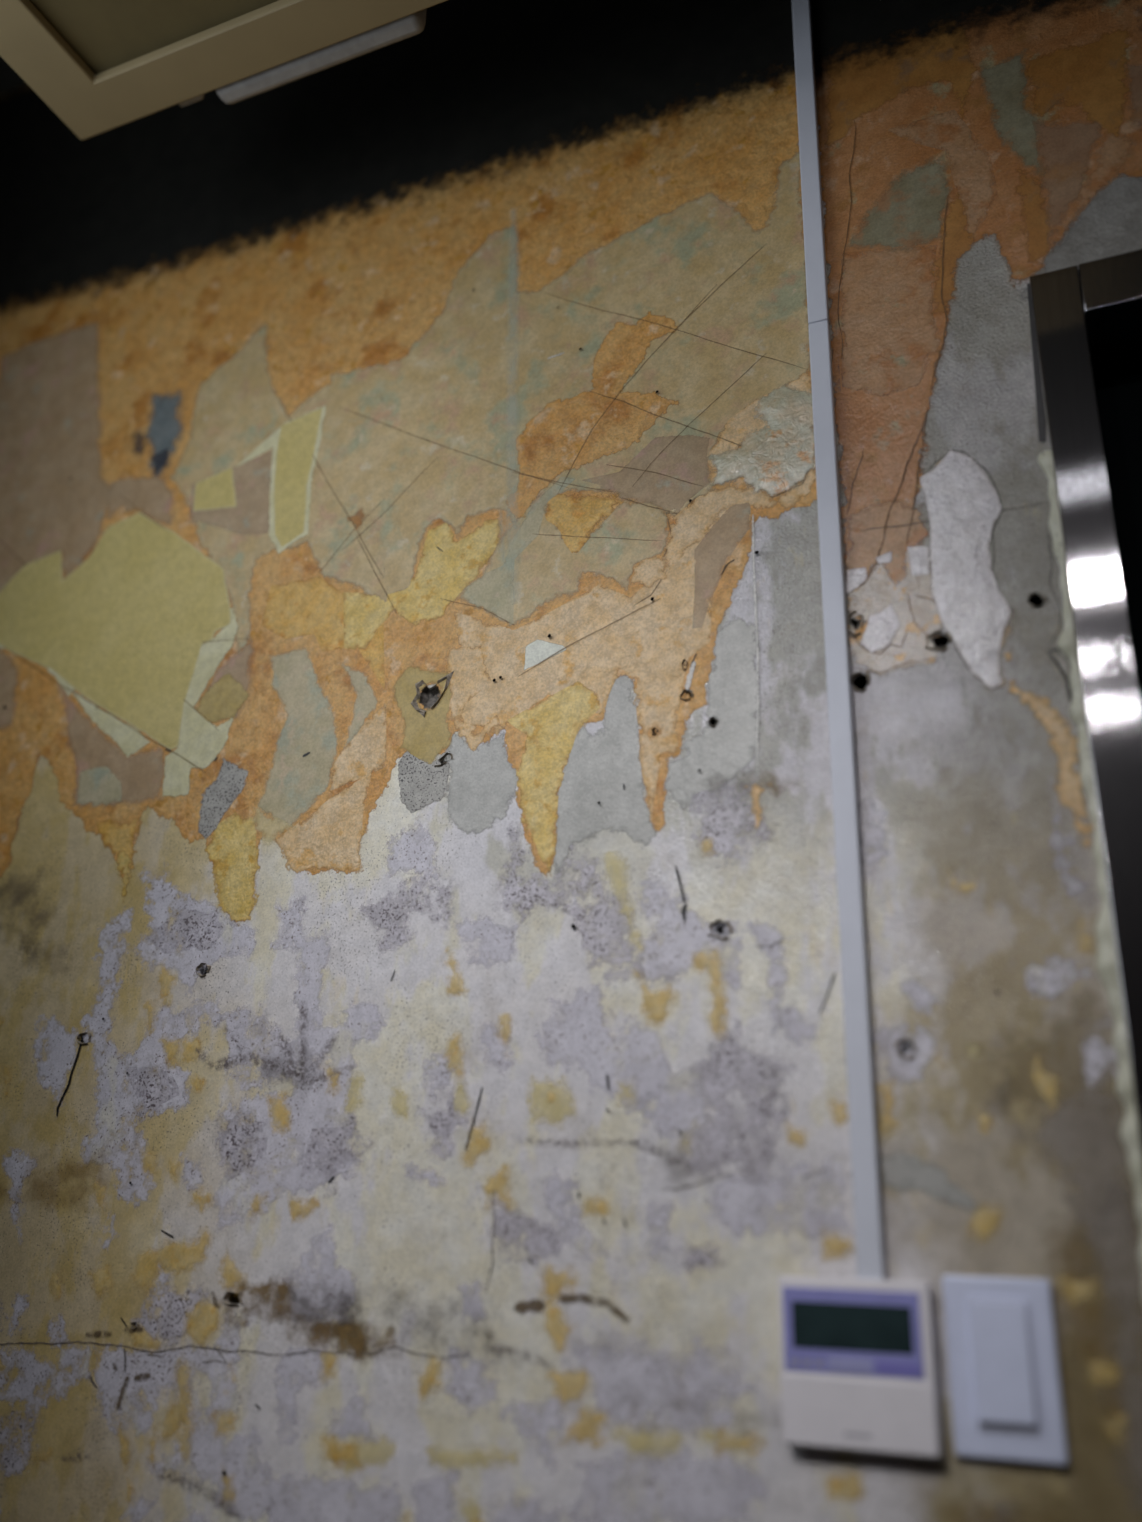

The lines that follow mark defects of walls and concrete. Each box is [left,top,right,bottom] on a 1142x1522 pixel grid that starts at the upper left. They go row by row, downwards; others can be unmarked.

peeling [837,246,939,396]
flaking render [134,393,182,475]
spalling [847,610,864,639]
flaking render [198,758,248,838]
flaking render [276,468,854,1238]
flaking render [33,818,386,1228]
flaking render [2,1149,36,1235]
flaking render [488,1169,606,1264]
flaking render [285,1224,356,1323]
flaking render [0,1265,326,1522]
crack [0,1341,468,1363]
damp [310,1323,394,1375]